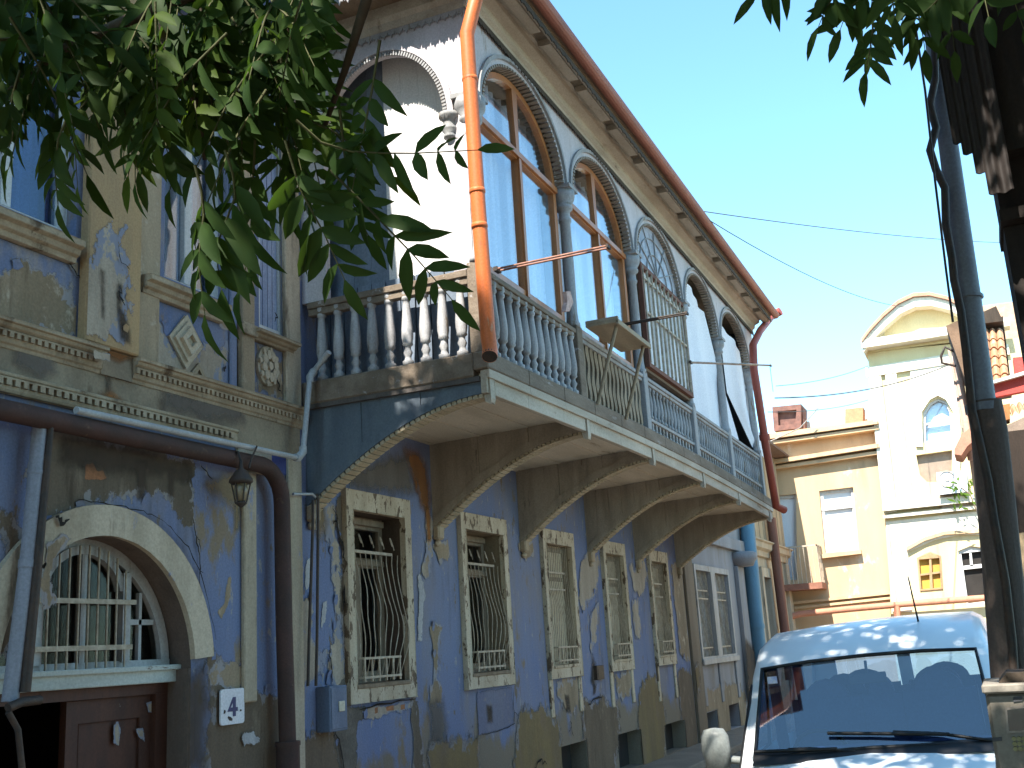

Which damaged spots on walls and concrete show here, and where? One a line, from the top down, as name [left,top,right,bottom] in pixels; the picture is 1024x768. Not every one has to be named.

flaking render [0,220,135,362]
leakage [61,440,190,499]
rust [407,452,431,540]
flaking render [303,495,345,687]
flaking render [417,516,450,707]
flaking render [578,551,600,654]
flaking render [427,726,480,768]
flaking render [513,670,667,768]